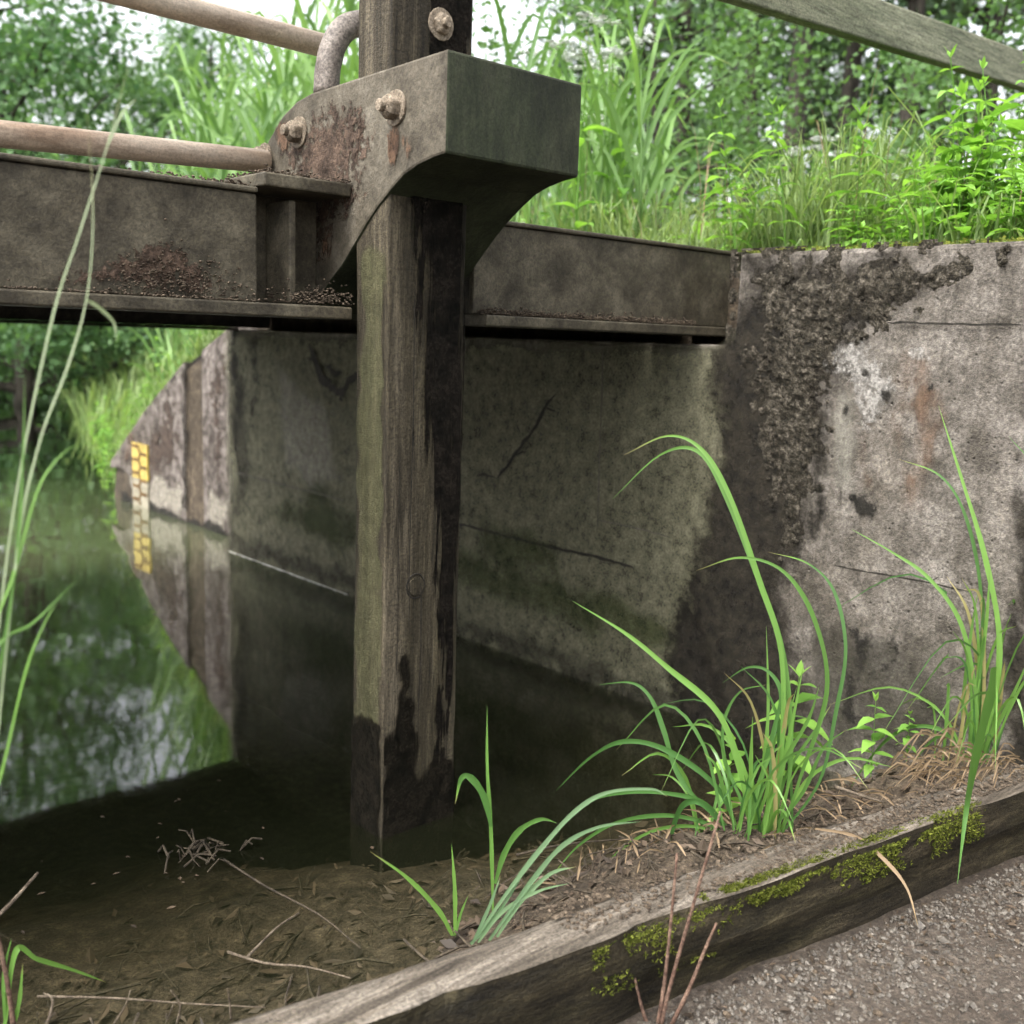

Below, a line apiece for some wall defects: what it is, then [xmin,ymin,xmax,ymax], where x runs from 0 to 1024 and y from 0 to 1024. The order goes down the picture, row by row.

corrosion [372,126,410,163]
spalling [725,236,1012,544]
crack [476,394,556,479]
crack [459,523,634,568]
water stain [496,254,937,784]
crack [835,565,969,592]